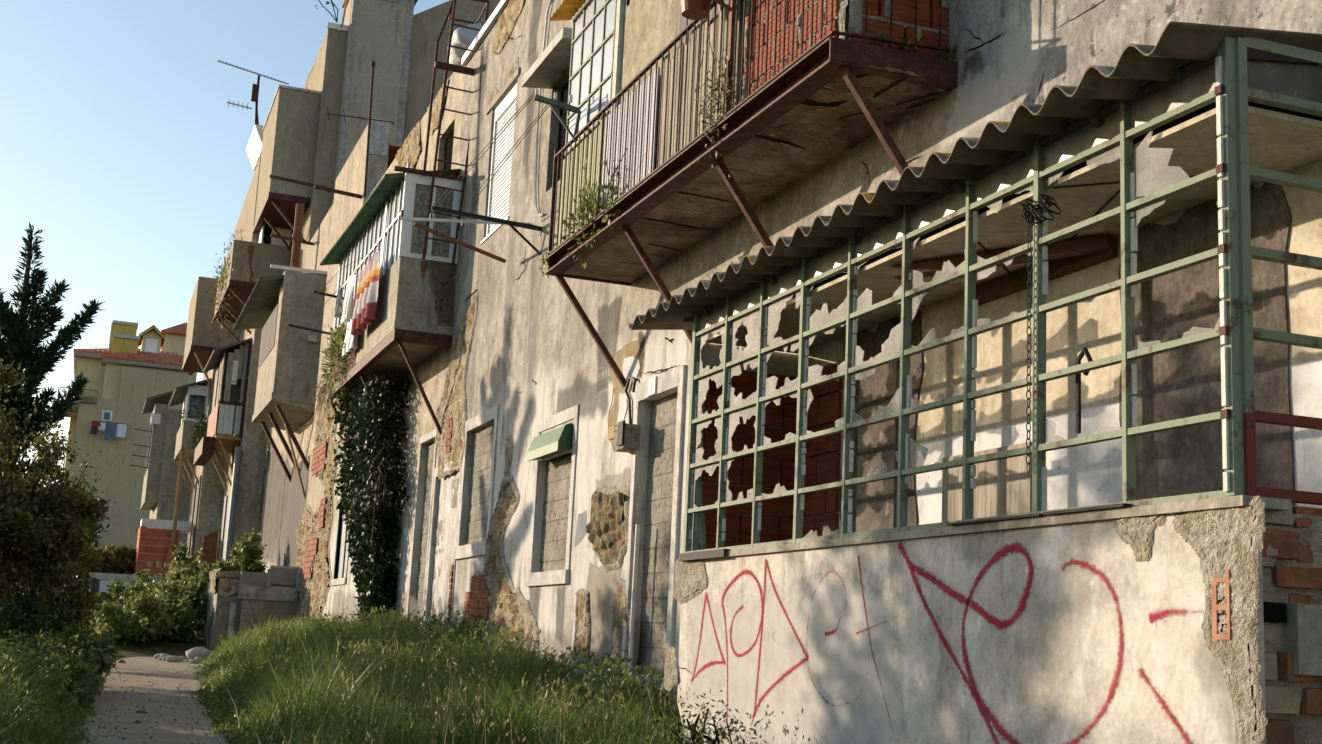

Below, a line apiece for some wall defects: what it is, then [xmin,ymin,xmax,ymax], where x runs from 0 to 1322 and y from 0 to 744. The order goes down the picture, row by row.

spalling [492,0,524,55]
crack [616,168,757,265]
crack [754,87,878,150]
spalling [296,389,342,621]
spalling [429,291,539,660]
spalling [573,485,631,697]
spalling [1114,495,1267,744]